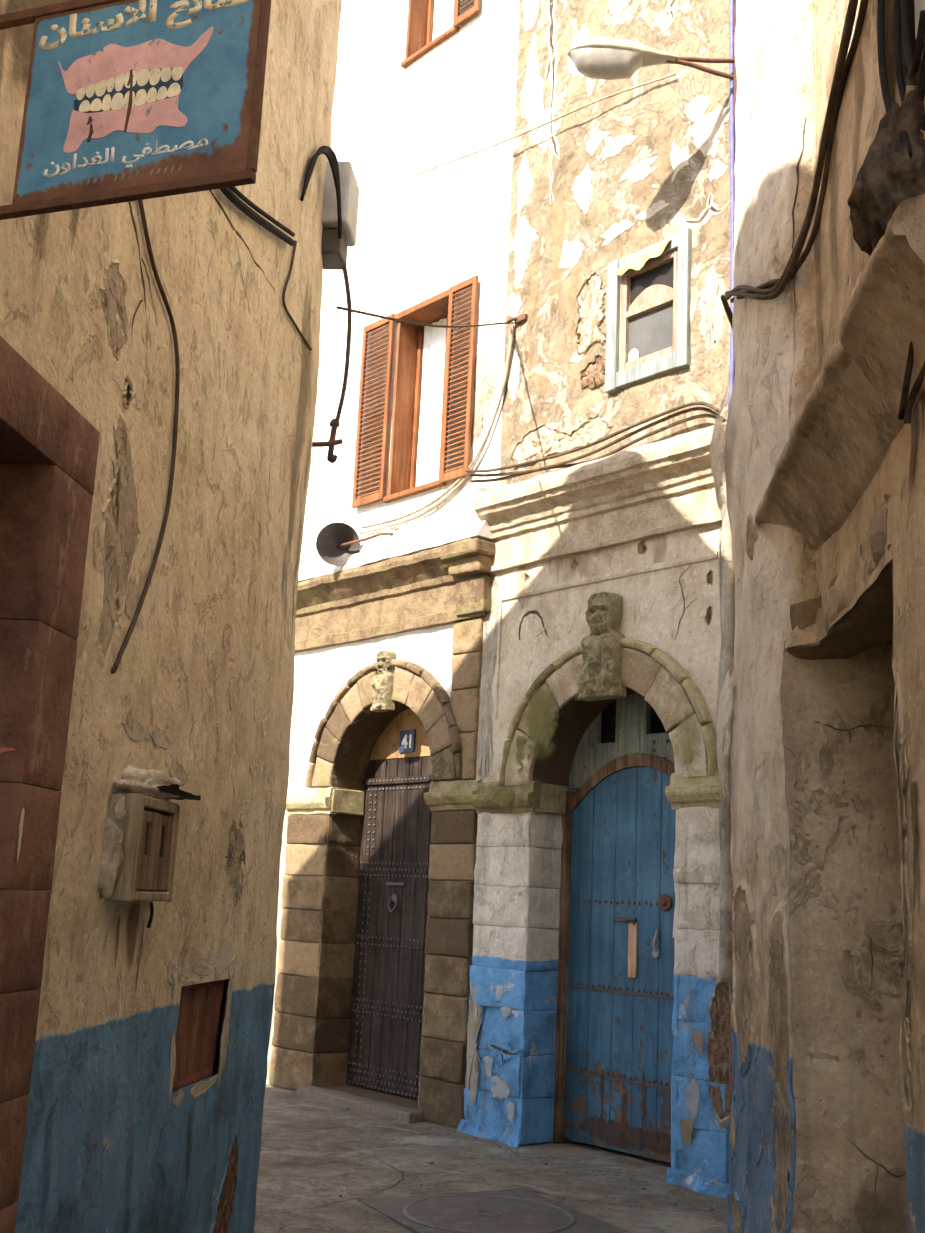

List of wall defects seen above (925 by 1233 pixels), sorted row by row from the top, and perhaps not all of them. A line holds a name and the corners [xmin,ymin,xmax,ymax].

peeling [507,0,551,328]
peeling [620,94,730,183]
spalling [570,269,607,390]
spalling [698,266,726,351]
flaking render [470,345,522,453]
spalling [510,413,613,470]
crack [675,564,695,640]
crack [812,720,894,755]
peeling [465,984,515,1122]
spalling [680,879,796,1233]
corrosion [580,1071,671,1154]
crack [851,1142,906,1194]